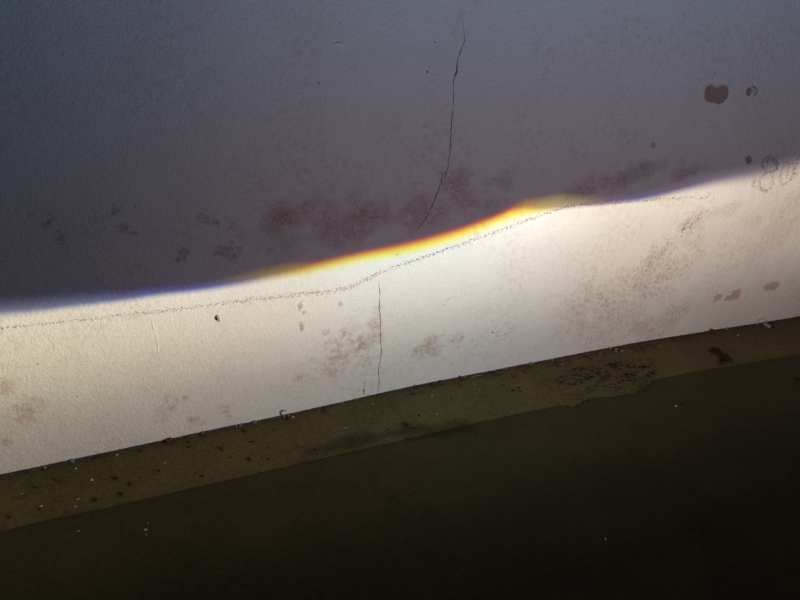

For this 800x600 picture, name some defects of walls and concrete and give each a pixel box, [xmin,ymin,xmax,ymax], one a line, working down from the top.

crack [421,25,465,225]
spalling [704,83,730,105]
crack [363,288,382,394]